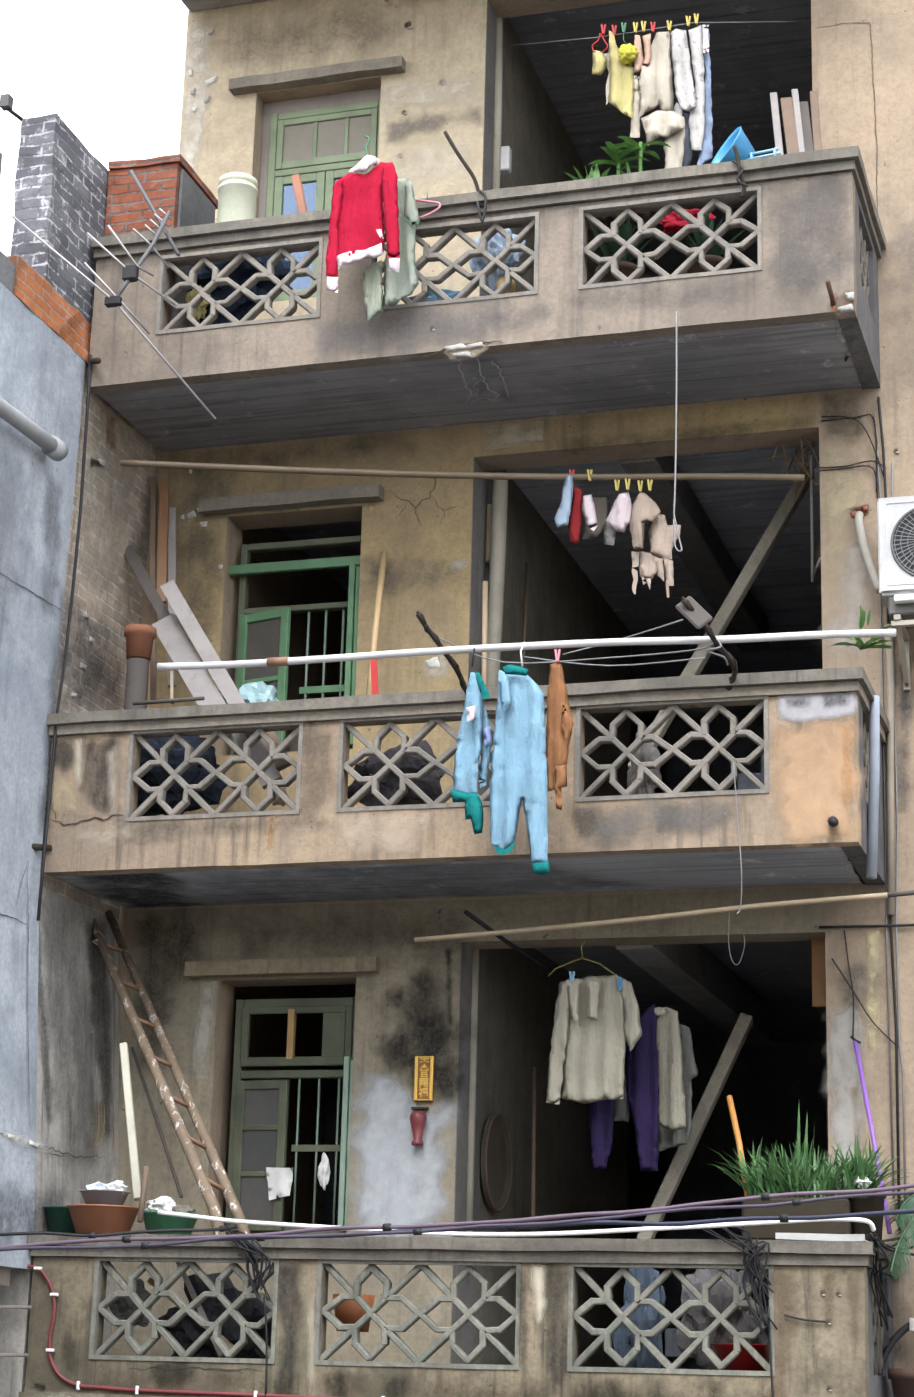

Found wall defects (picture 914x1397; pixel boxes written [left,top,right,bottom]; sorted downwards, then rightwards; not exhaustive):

crack [392,471,454,524]
water stain [38,954,51,1118]
water stain [89,928,111,1132]